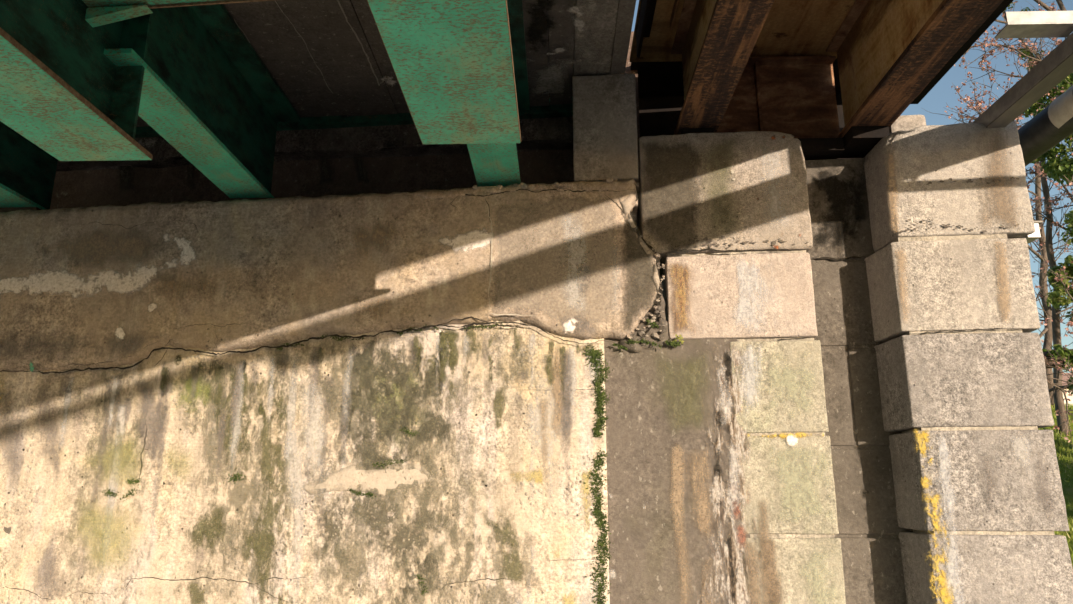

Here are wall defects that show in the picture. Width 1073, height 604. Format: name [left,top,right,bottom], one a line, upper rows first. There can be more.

water stain [527,0,603,94]
water stain [440,229,492,251]
crack [687,246,804,254]
water stain [814,170,866,247]
water stain [112,327,141,351]
crack [0,183,662,535]
water stain [535,342,598,463]
water stain [91,355,181,549]
water stain [187,362,300,604]
water stain [309,328,534,604]
water stain [38,549,55,594]